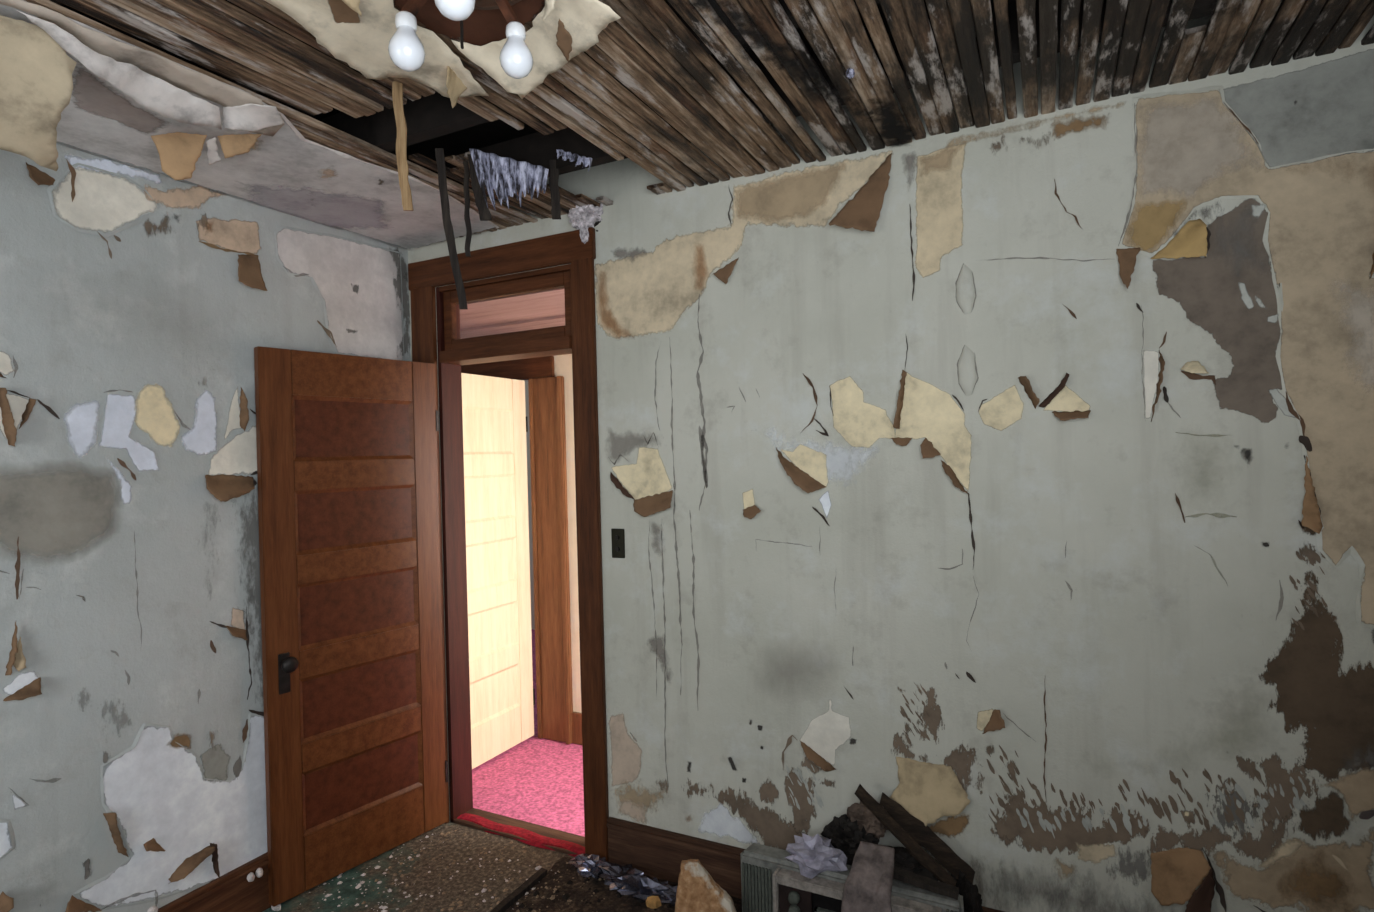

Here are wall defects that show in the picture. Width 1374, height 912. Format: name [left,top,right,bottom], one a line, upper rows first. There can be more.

flaking render [1153,198,1295,423]
flaking render [100,394,158,503]
flaking render [182,391,217,454]
leakage [0,469,117,557]
flaking render [683,735,835,850]
flaking render [891,687,994,794]
flaking render [990,527,1374,885]
flaking render [247,868,263,882]